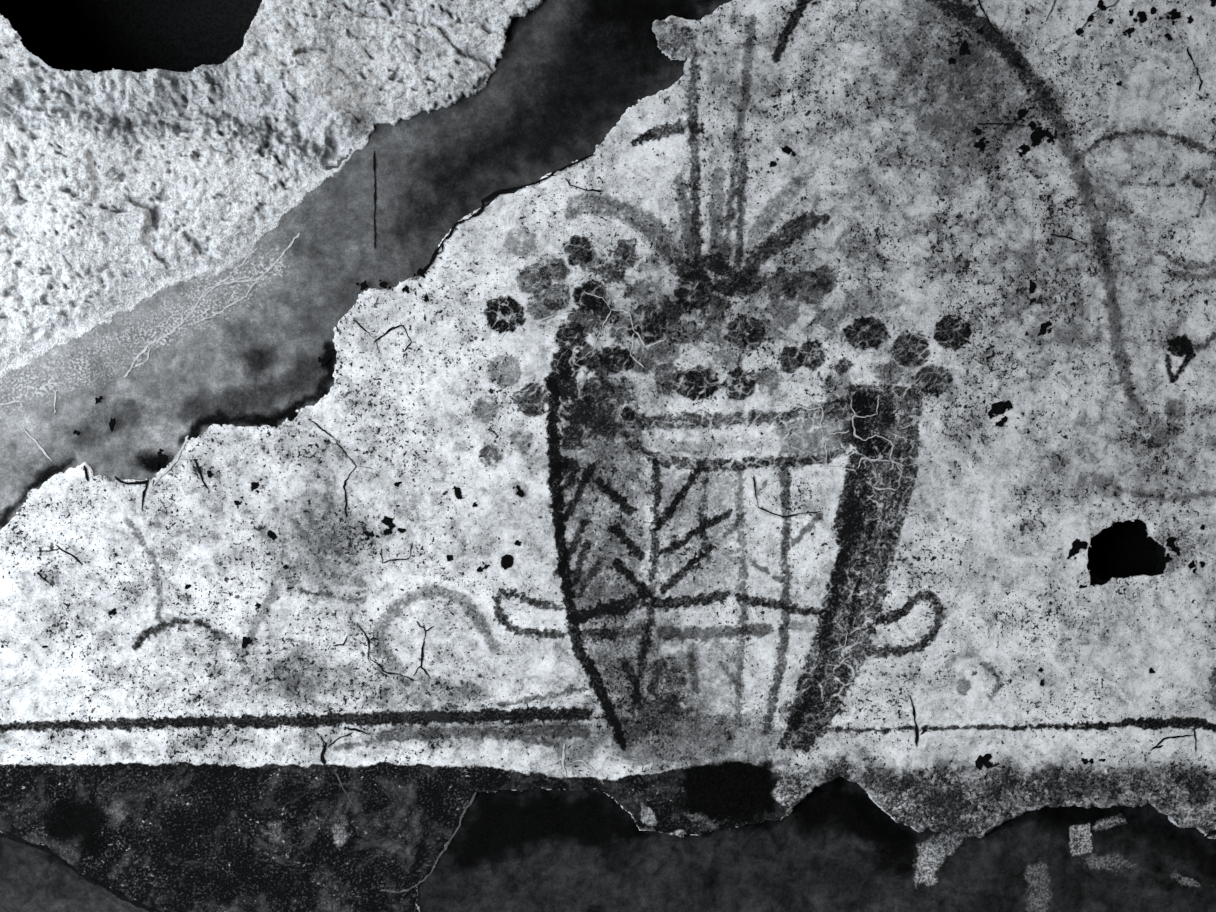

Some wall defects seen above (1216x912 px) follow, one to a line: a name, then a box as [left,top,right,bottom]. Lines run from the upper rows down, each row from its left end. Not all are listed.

peeling [767,145,796,167]
spalling [0,0,542,381]
peeling [254,407,298,428]
peeling [146,448,169,470]
peeling [234,482,259,505]
peeling [363,516,406,541]
peeling [477,540,522,572]
peeling [975,753,993,770]
spalling [416,776,1216,912]
spalling [0,832,149,912]